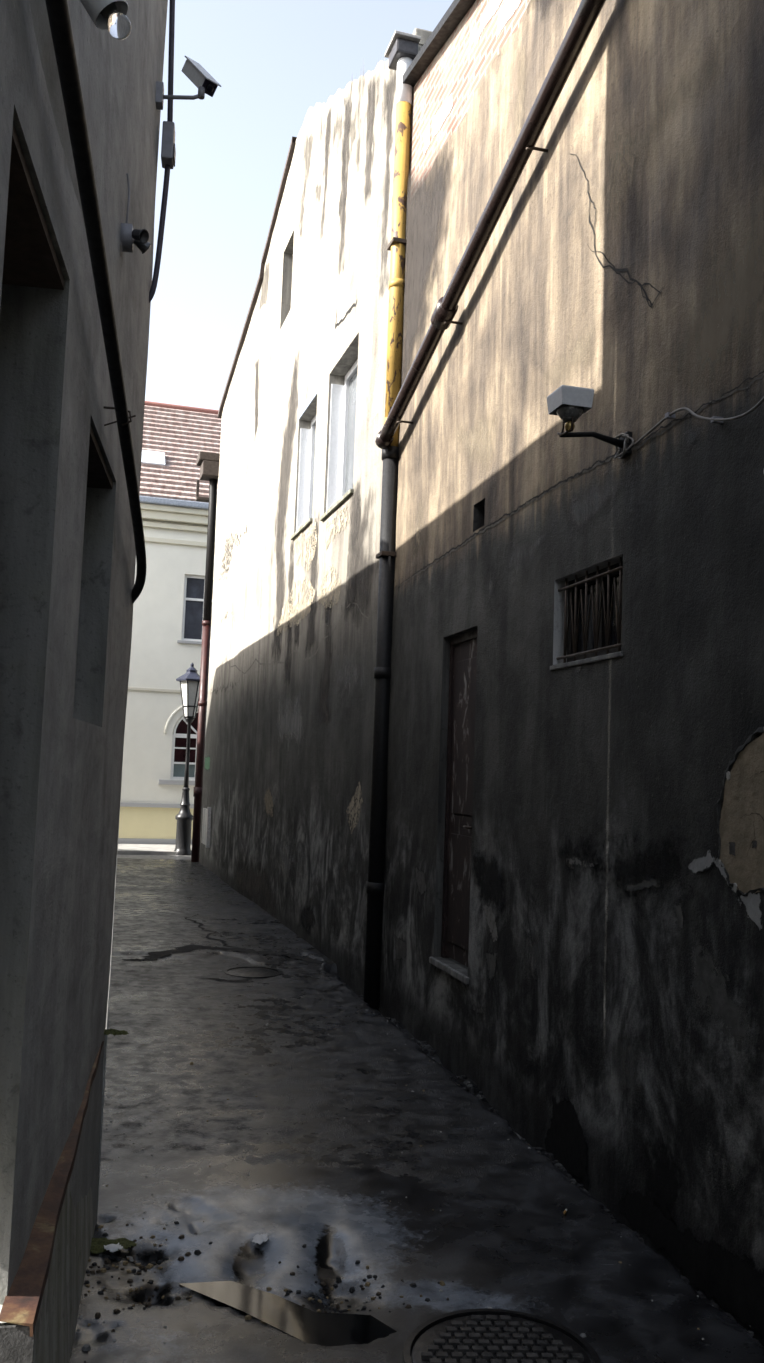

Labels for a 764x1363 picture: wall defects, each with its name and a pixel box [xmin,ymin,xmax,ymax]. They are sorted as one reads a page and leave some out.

water stain [321,78,395,293]
water stain [401,158,448,387]
crack [571,154,663,308]
water stain [272,351,373,721]
water stain [559,838,691,931]
flaking render [688,727,764,930]